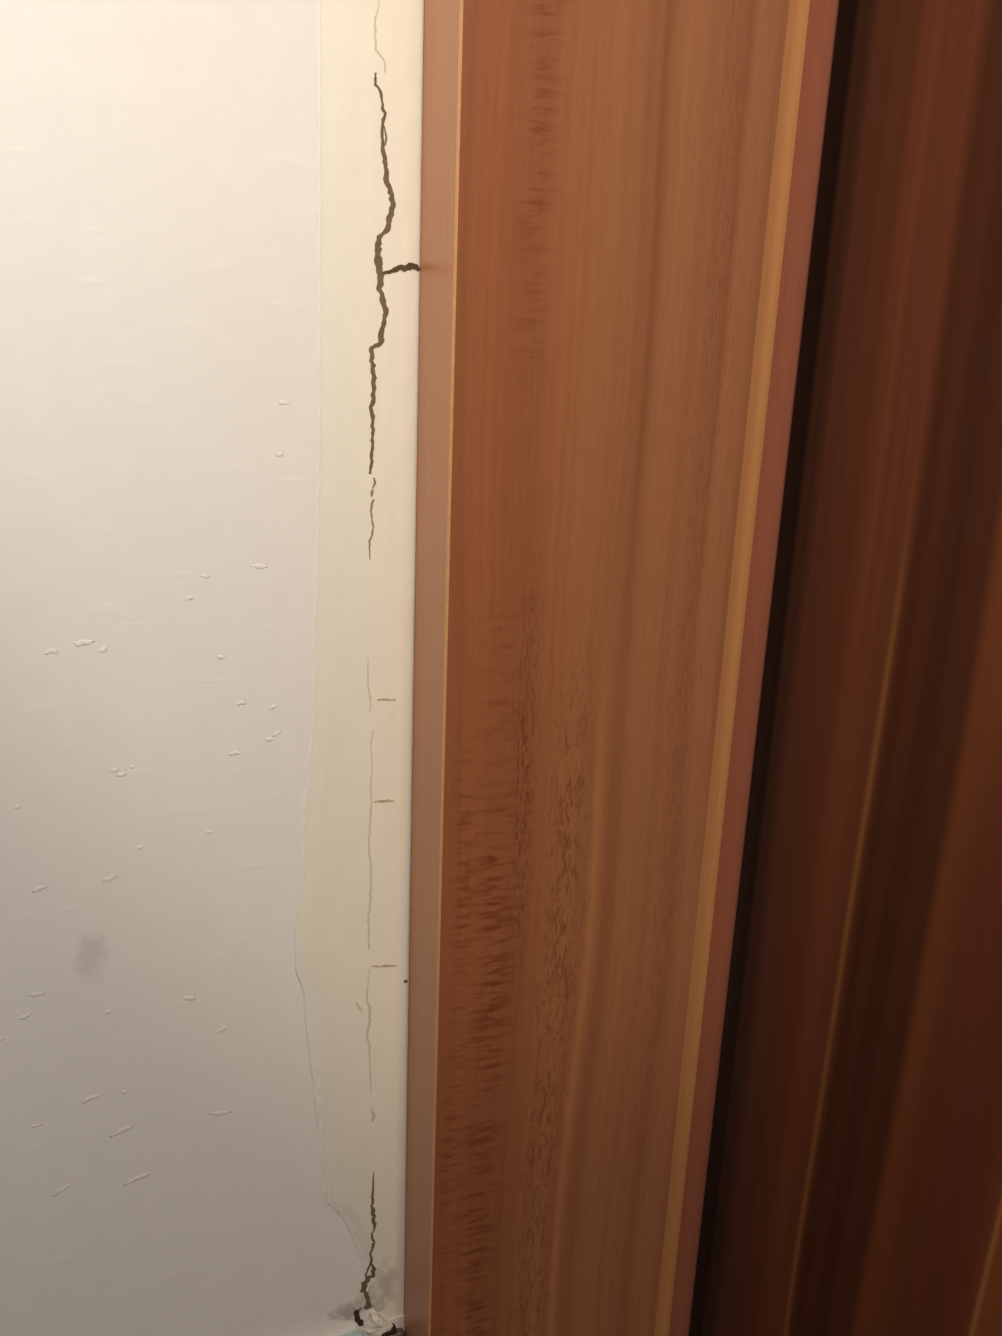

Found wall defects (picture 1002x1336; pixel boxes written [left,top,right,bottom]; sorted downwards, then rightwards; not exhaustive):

crack [368,0,420,560]
crack [356,658,397,1122]
crack [360,1172,377,1310]
spalling [352,1282,397,1336]